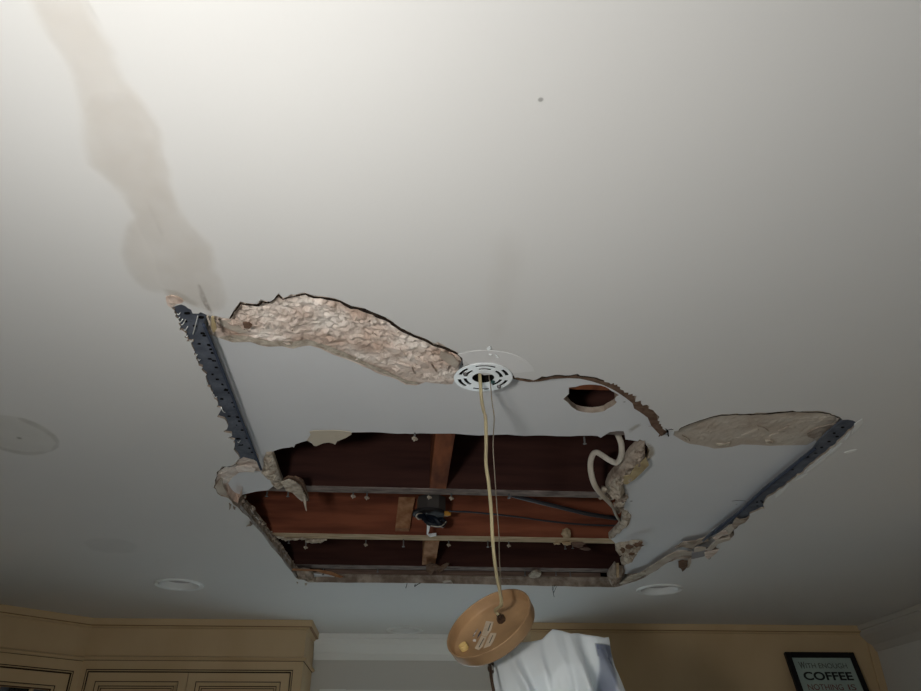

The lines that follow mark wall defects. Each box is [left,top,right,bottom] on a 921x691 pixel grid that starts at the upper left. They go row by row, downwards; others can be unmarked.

spalling [206,293,463,385]
crack [513,374,673,437]
spalling [674,411,840,449]
spalling [214,453,261,503]